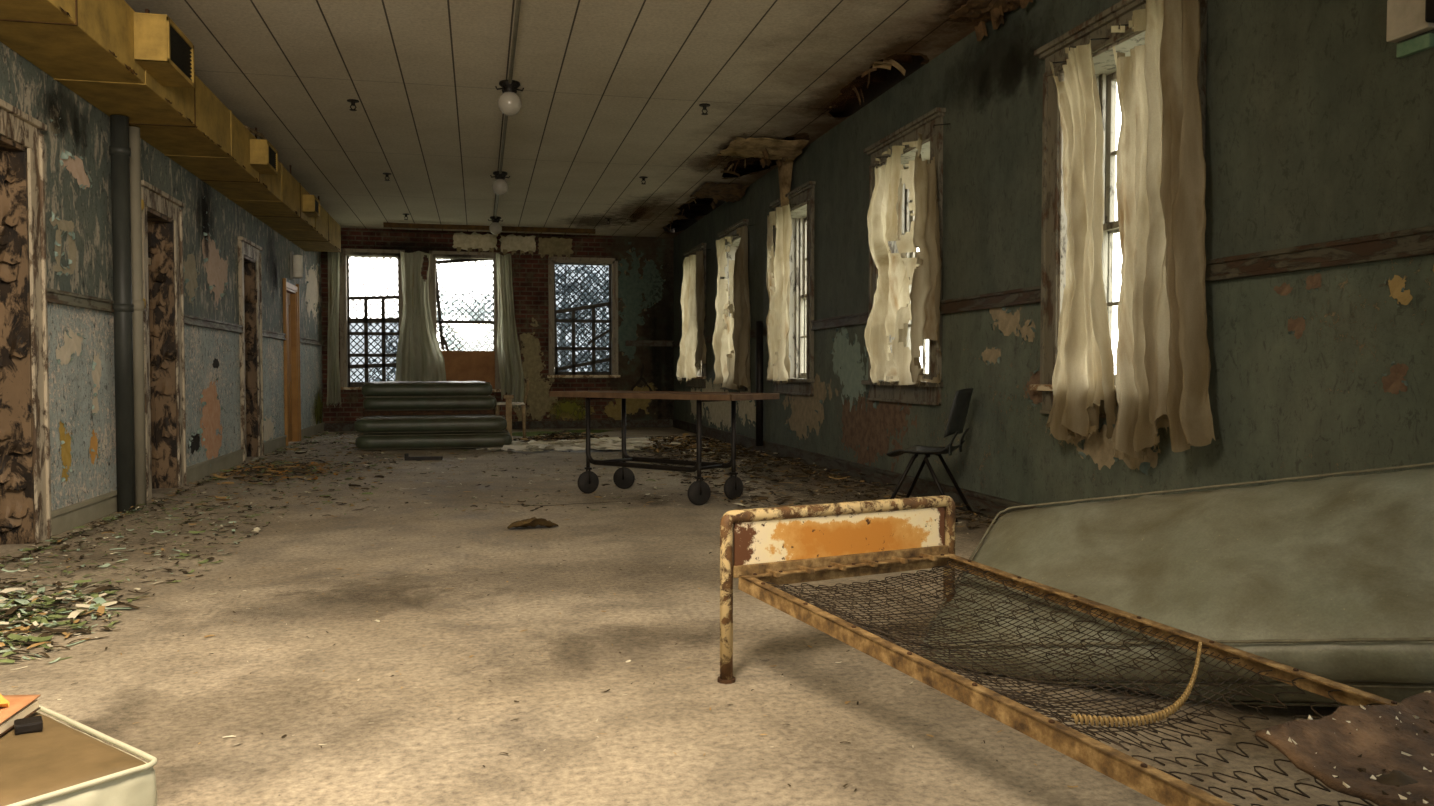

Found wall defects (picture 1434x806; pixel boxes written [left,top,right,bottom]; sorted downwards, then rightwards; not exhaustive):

peeling [49,212,77,276]
peeling [59,150,93,189]
peeling [183,196,228,309]
peeling [305,263,322,324]
water stain [570,200,670,226]
flaking render [614,242,666,364]
peeling [56,329,102,482]
peeling [188,358,223,467]
flaking render [512,318,558,421]
flaking render [601,382,658,420]